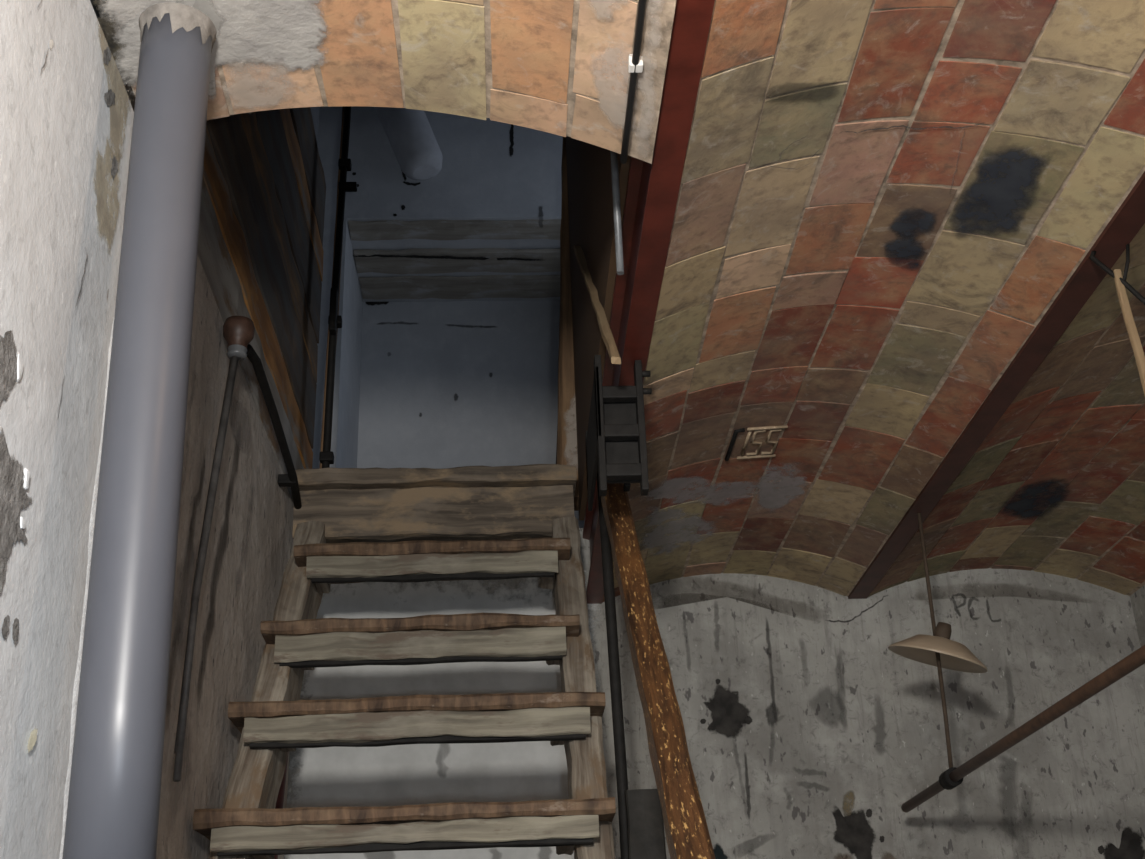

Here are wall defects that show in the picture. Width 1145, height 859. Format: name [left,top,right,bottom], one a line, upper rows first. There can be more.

spalling [0,330,23,407]
spalling [0,428,32,594]
spalling [2,615,19,644]
peeling [700,679,752,738]
peeling [713,844,728,859]
peeling [833,791,892,859]
peeling [1098,827,1145,859]